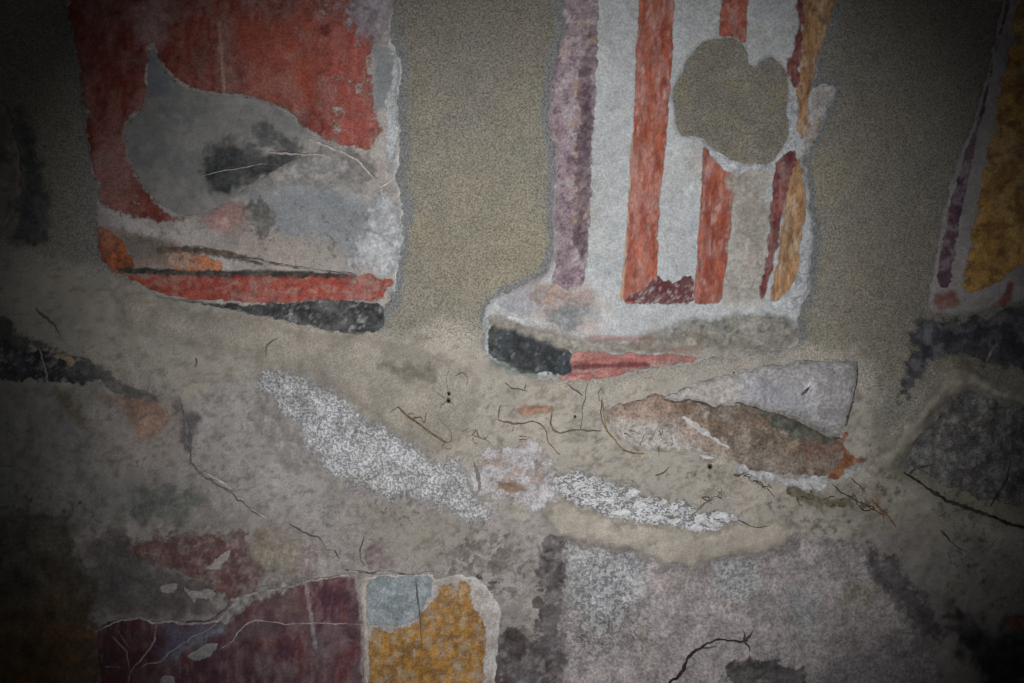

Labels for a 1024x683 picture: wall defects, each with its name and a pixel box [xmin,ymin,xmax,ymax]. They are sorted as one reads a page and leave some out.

flaking render [125,50,350,215]
spalling [384,52,400,175]
flaking render [673,37,836,313]
crack [95,398,440,683]
crack [474,383,598,495]
spalling [607,394,844,477]
crack [904,453,1024,529]
crack [668,631,753,683]